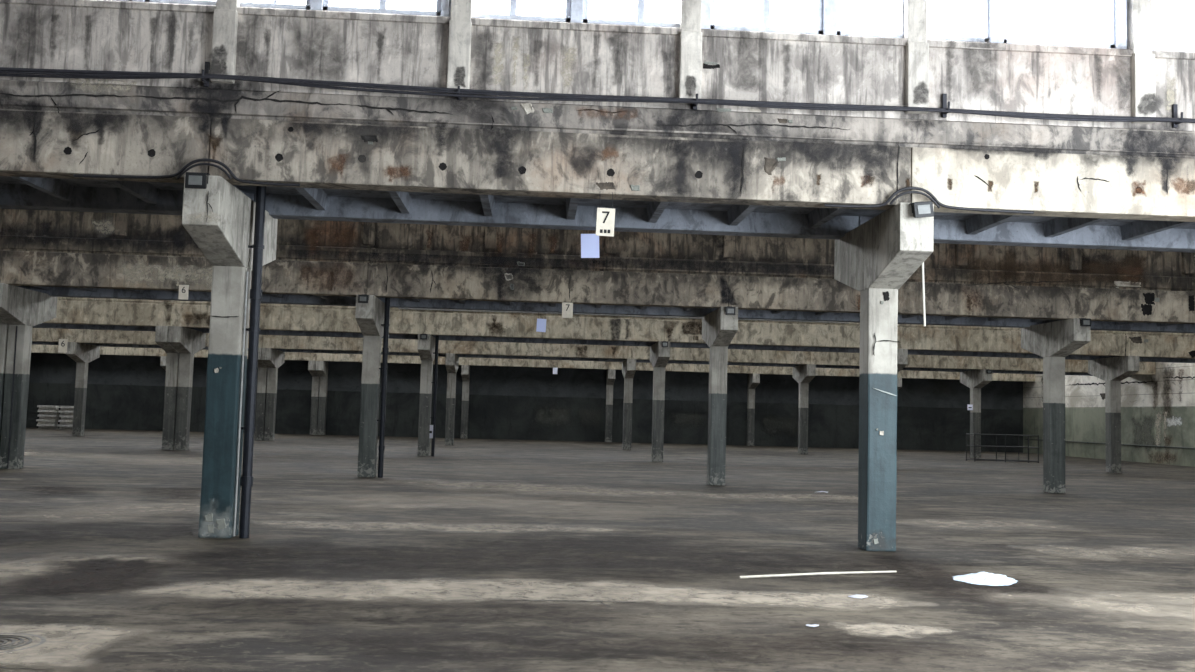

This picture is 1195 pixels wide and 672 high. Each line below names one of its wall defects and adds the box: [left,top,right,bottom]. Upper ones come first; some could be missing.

water stain [197,105,230,137]
water stain [493,129,518,177]
water stain [864,155,874,184]
water stain [1158,153,1174,191]